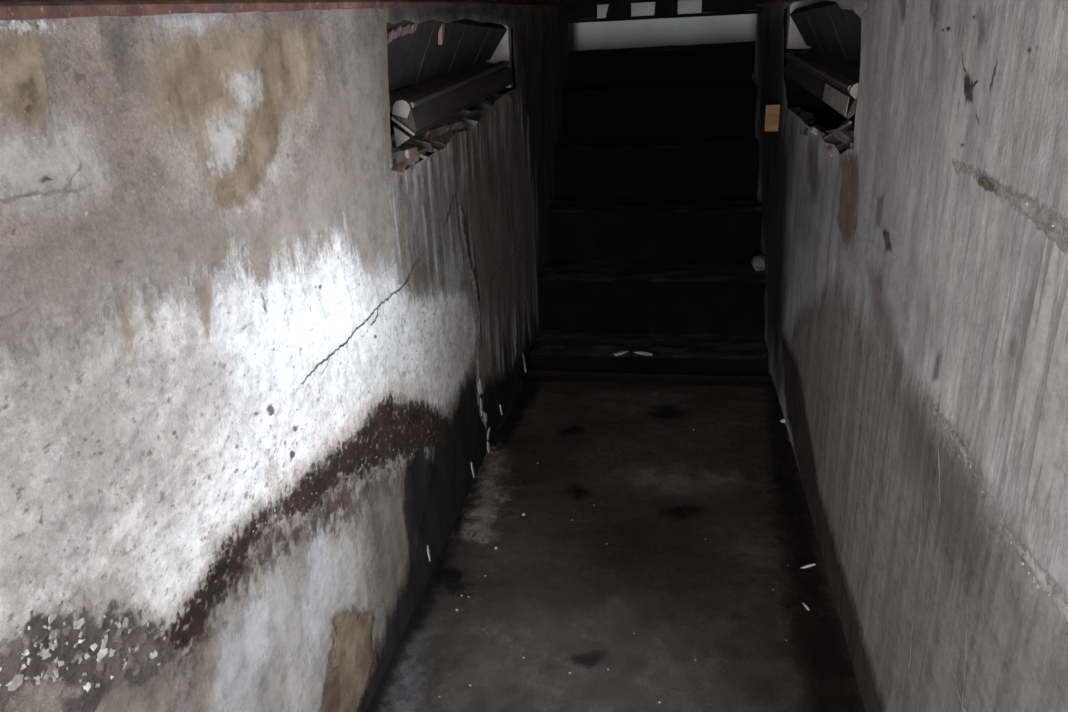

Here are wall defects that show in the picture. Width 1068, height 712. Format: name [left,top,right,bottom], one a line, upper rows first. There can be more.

spalling [387,23,418,44]
spalling [836,0,868,18]
crack [0,158,91,203]
spalling [389,94,512,181]
spalling [787,107,855,162]
crack [294,259,418,394]
water stain [0,14,804,712]
peeling [929,399,1068,622]
peeling [0,593,178,712]